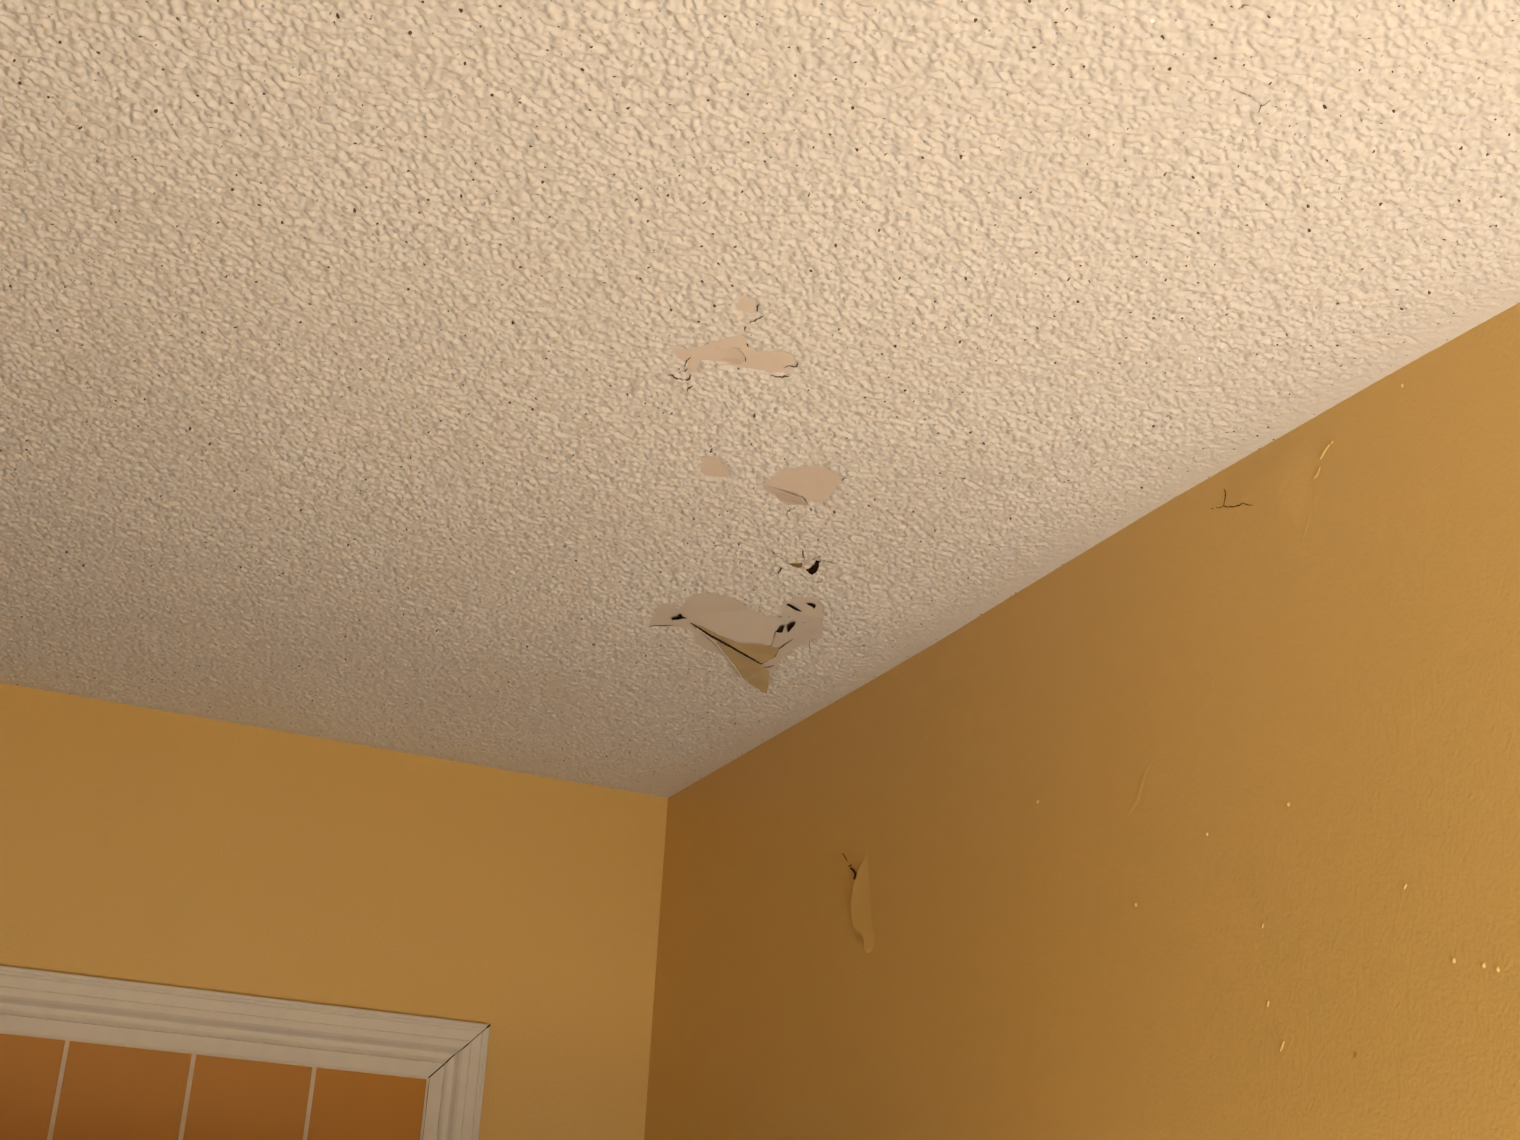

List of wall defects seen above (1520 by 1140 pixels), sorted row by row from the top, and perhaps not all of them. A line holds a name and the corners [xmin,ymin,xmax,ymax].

peeling [668,296,798,392]
peeling [762,466,846,514]
peeling [649,592,824,693]